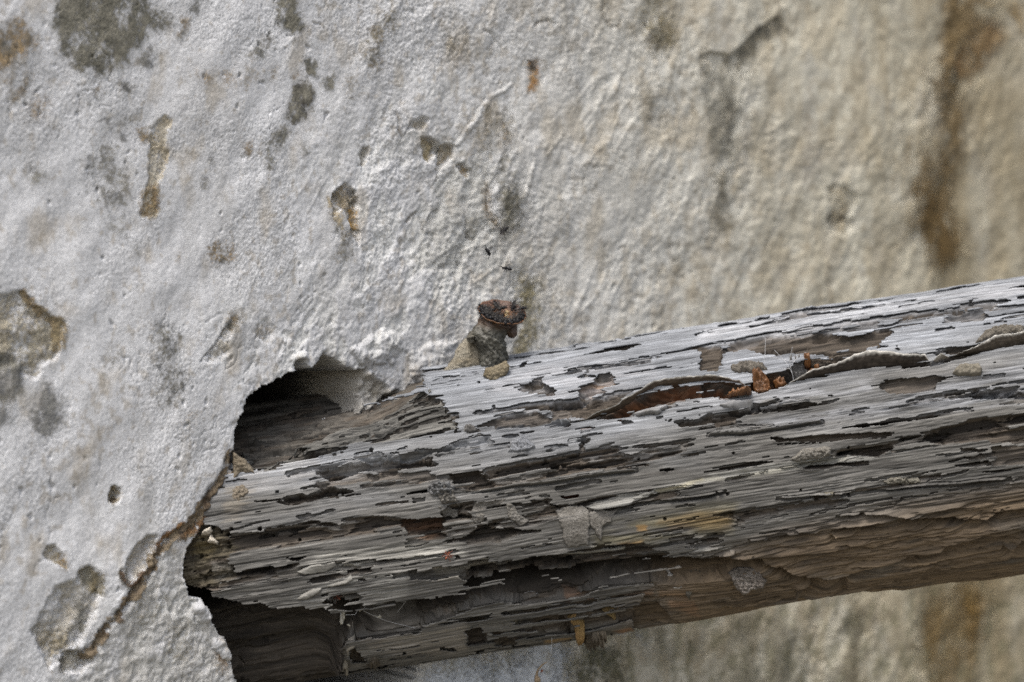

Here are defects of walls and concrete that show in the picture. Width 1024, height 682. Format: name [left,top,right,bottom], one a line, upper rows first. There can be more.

flaking render [138,115,173,219]
flaking render [327,186,357,232]
flaking render [0,288,68,401]
flaking render [32,536,231,682]
crack [77,448,233,659]
flaking render [201,527,219,545]